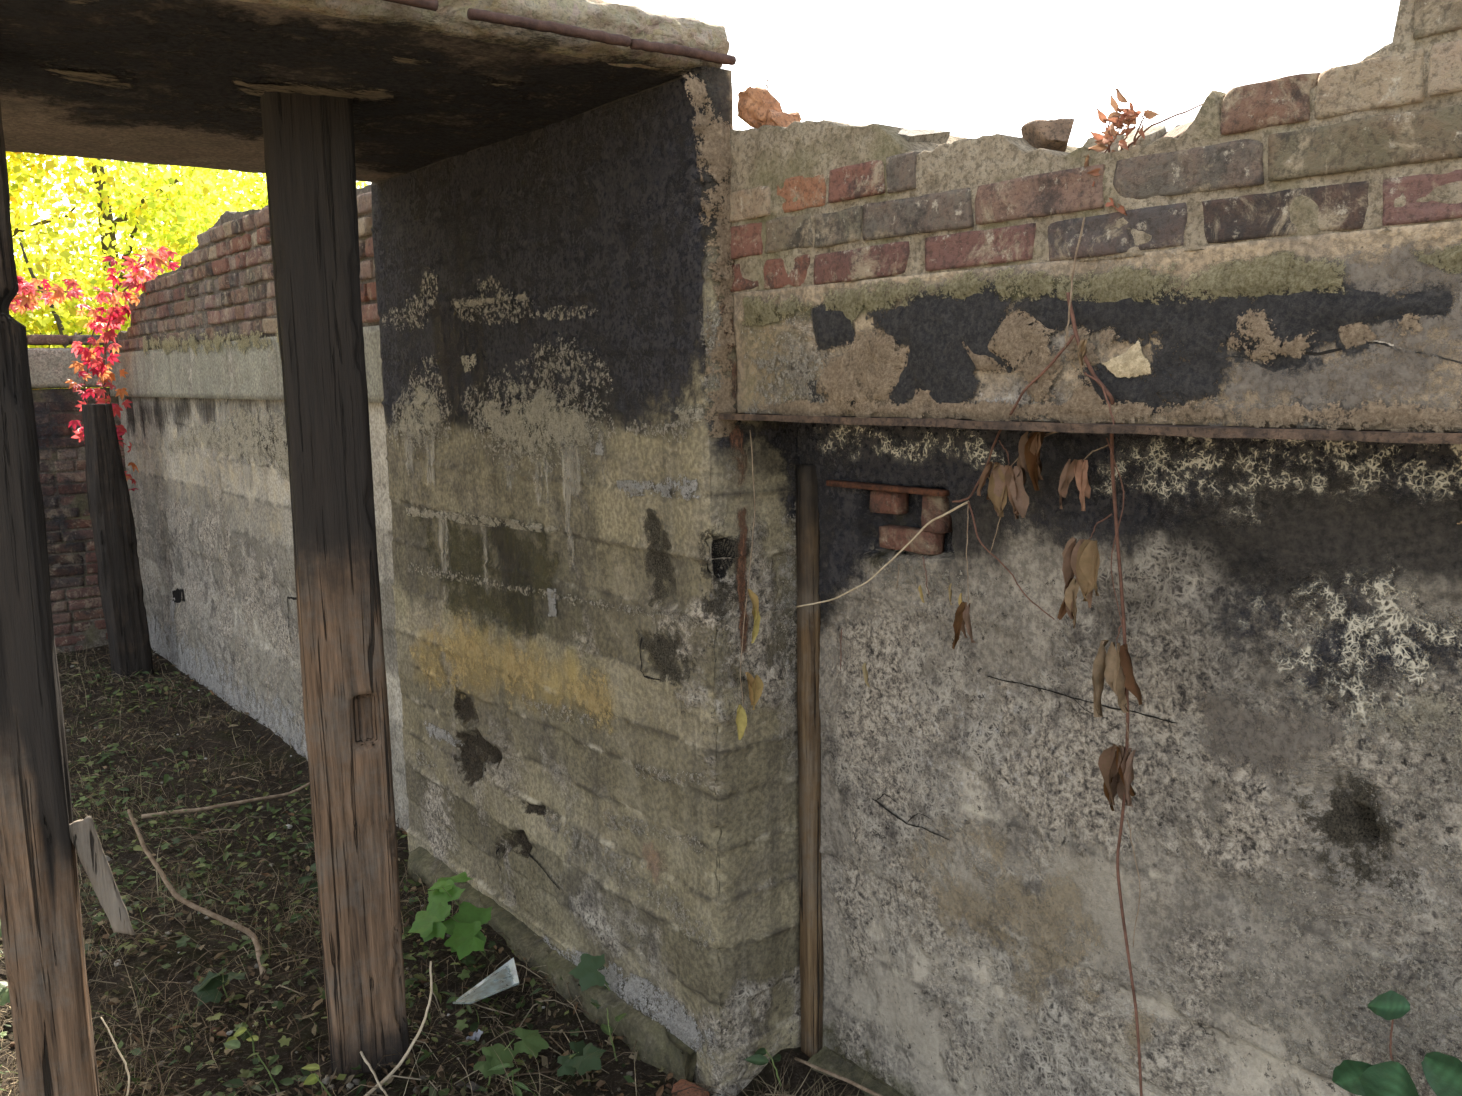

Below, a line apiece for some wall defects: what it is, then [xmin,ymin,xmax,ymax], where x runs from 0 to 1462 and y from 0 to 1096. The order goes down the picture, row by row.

leakage [382,268,705,731]
peeling [683,72,740,438]
peeling [758,243,1462,433]
leakage [1209,589,1293,655]